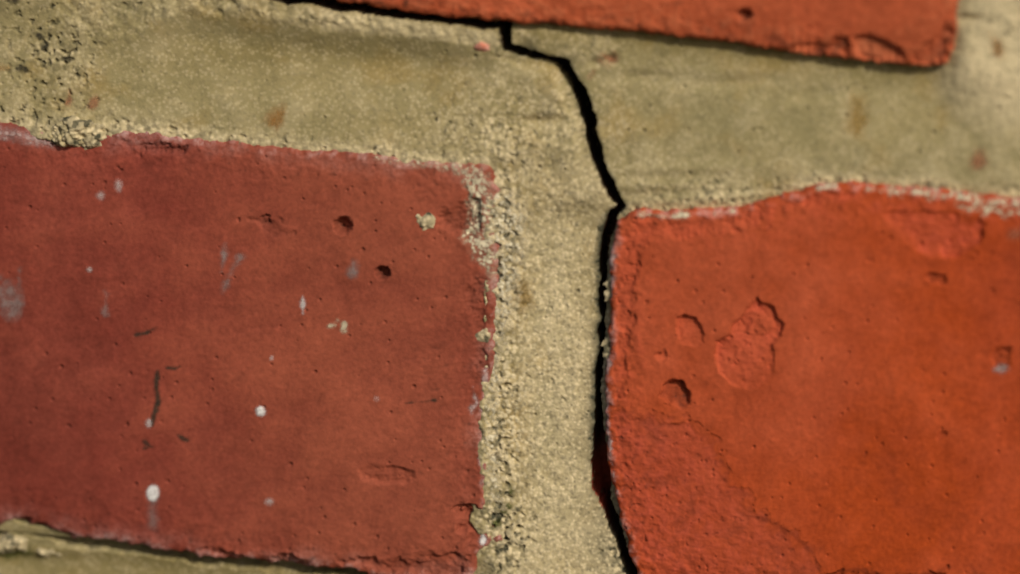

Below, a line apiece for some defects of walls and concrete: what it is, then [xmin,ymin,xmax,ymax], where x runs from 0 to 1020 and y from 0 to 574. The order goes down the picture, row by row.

crack [276,0,638,574]
spalling [607,187,881,574]
spalling [880,208,988,286]
peeling [988,345,1015,374]